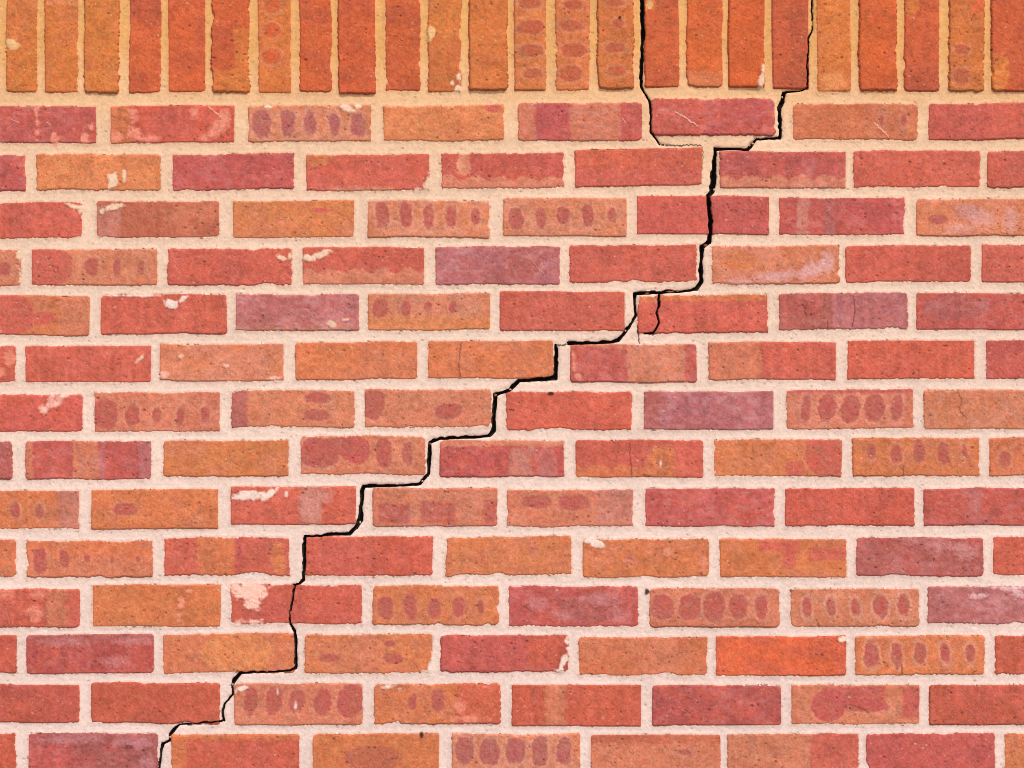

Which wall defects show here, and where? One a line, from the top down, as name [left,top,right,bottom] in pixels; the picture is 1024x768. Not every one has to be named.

crack [158,0,813,768]